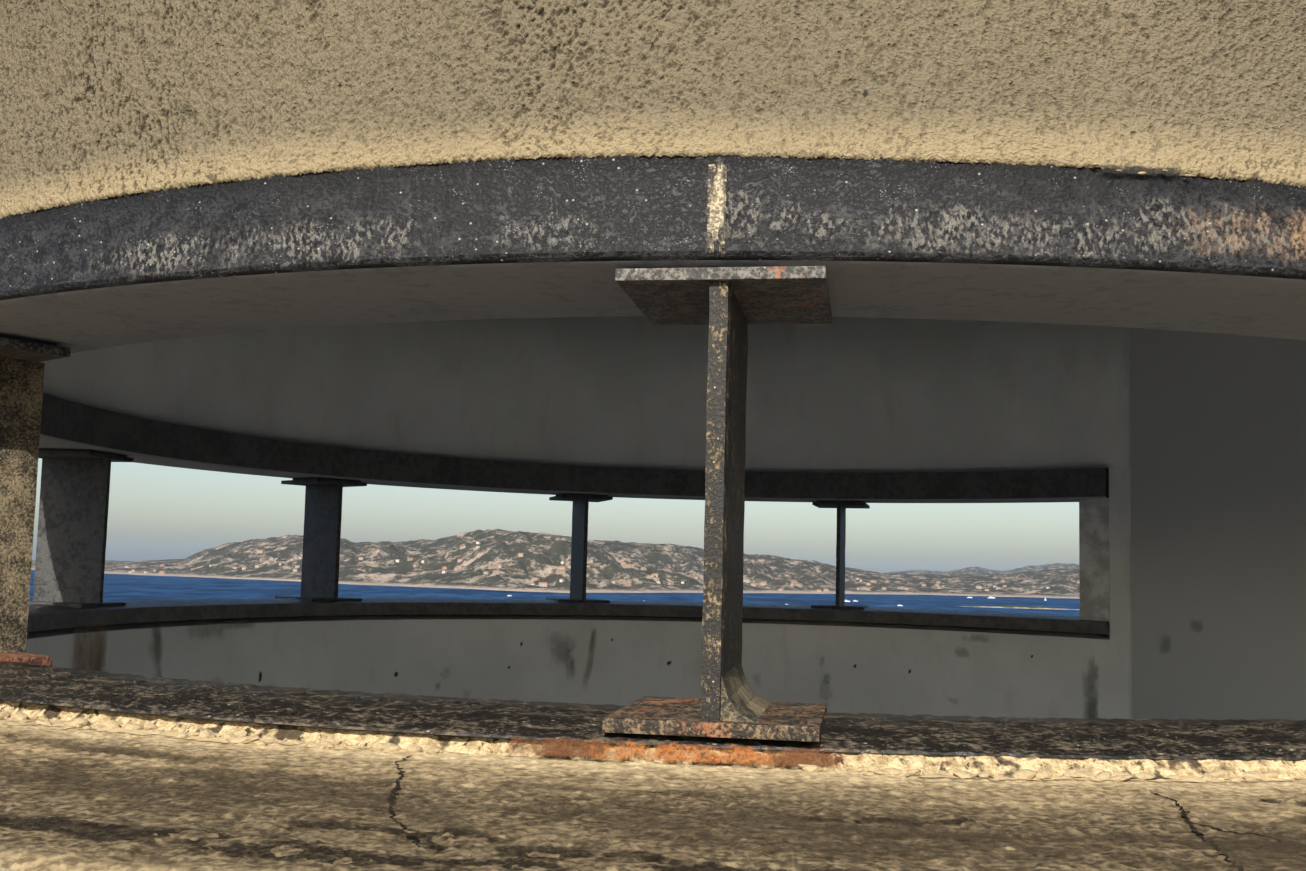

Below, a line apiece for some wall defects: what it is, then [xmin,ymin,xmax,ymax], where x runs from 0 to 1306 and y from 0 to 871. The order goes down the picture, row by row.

rust [506,738,844,767]
crack [385,755,421,847]
crack [1150,790,1292,871]